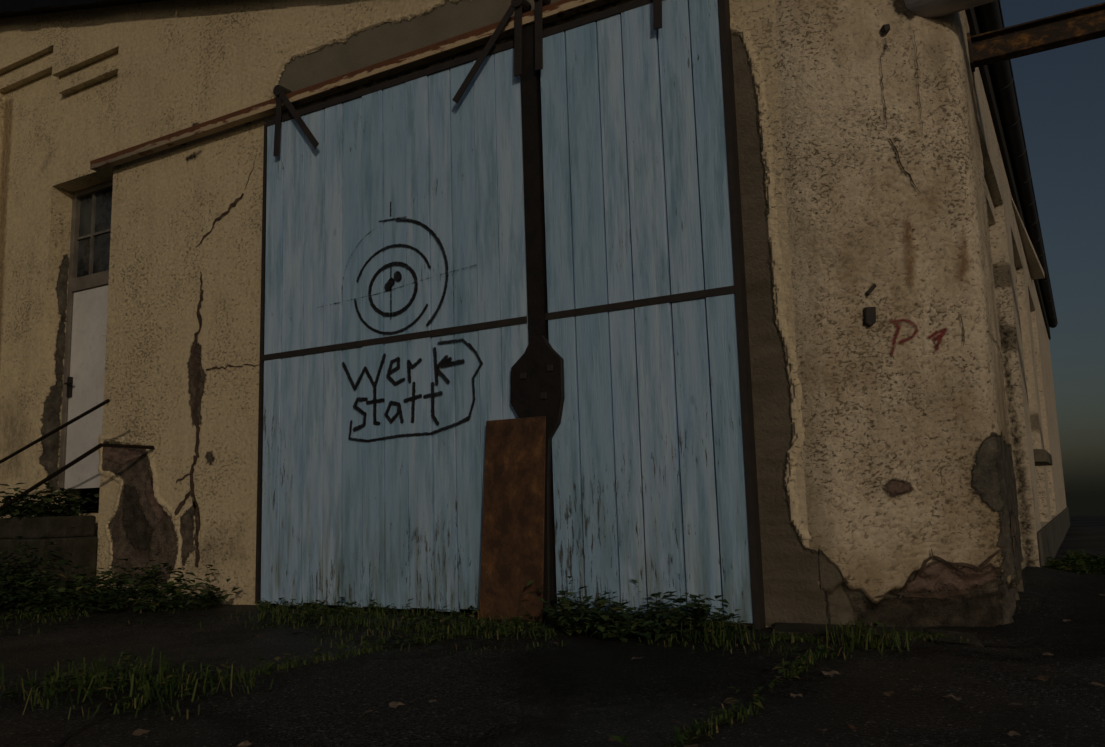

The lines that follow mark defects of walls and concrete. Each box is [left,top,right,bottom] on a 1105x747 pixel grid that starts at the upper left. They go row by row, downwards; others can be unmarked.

flaking render [271,0,515,115]
flaking render [39,254,69,492]
flaking render [187,341,206,427]
crack [171,154,257,567]
flaking render [730,18,855,627]
flaking render [98,434,196,594]
flaking render [883,478,914,497]